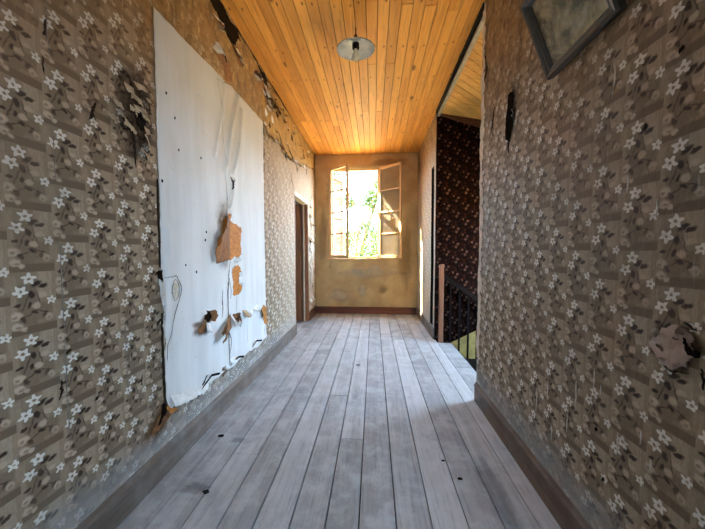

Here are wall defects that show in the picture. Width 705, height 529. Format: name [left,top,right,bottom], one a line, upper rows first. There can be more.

spalling [108,81,153,161]
flaking render [210,0,316,172]
spalling [505,88,516,154]